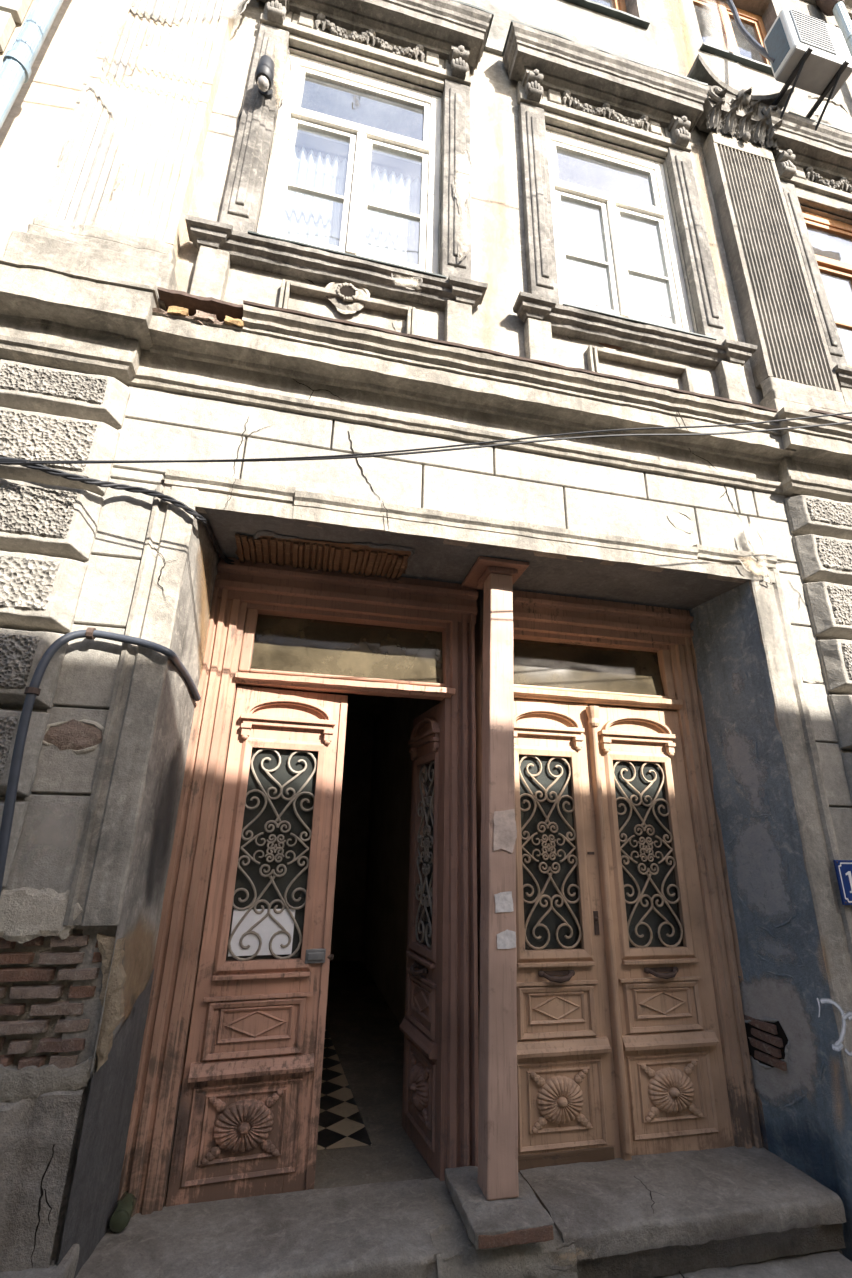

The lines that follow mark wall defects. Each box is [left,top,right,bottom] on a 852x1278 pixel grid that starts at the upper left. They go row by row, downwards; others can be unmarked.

peeling [129,0,250,27]
peeling [167,306,244,328]
crack [224,415,272,509]
crack [348,431,390,533]
spalling [42,719,105,755]
peeling [719,730,795,928]
spalling [0,887,127,1103]
peeling [738,971,824,1108]
crack [31,1144,55,1267]